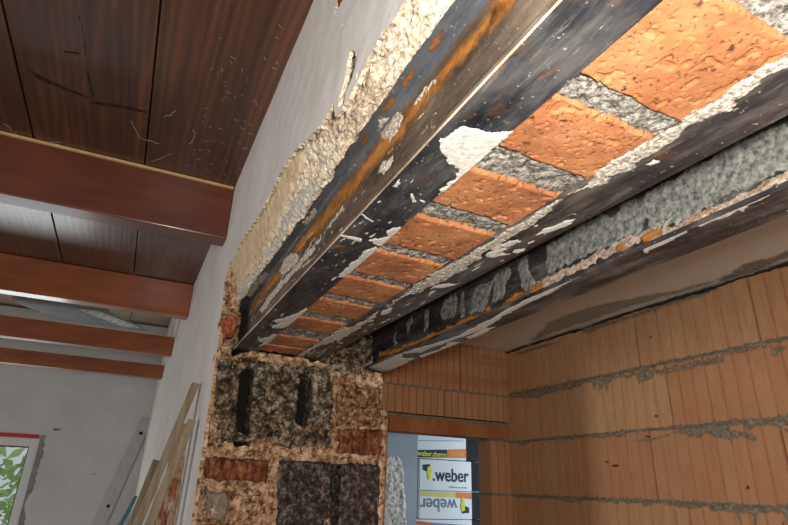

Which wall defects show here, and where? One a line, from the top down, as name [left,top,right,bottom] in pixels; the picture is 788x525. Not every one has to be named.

crack [28,12,147,113]
flaking render [231,0,455,304]
corrosion [292,0,515,255]
damp [510,337,788,398]
damp [518,429,637,446]
damp [648,414,788,442]